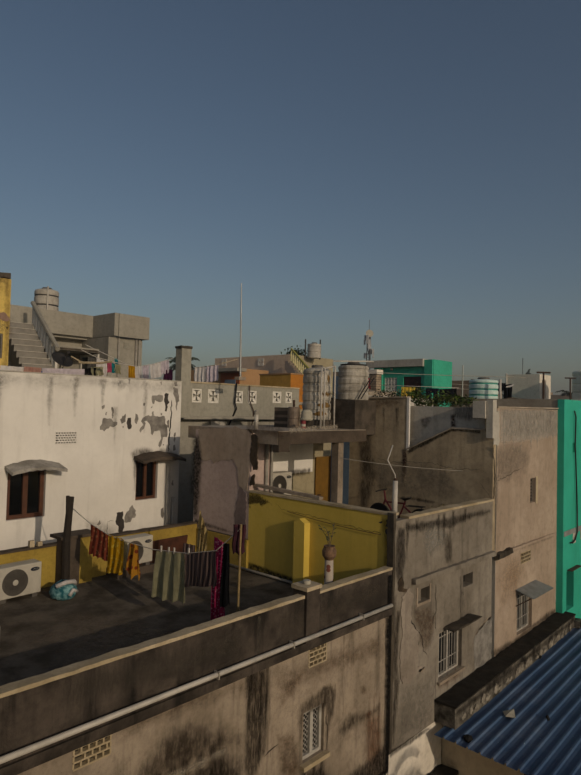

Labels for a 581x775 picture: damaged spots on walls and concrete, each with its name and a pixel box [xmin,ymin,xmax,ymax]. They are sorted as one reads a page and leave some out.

peeling [100,382,179,451]
peeling [115,505,136,532]
water stain [354,511,483,775]
water stain [144,731,238,775]
water stain [246,671,267,775]
water stain [302,687,335,720]